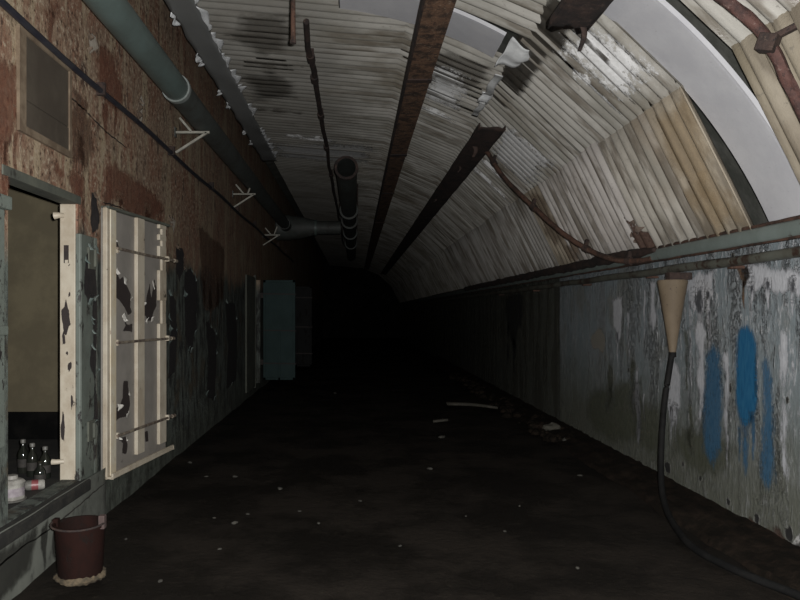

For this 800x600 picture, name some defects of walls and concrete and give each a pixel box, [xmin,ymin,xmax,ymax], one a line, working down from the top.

peeling [84,192,101,423]
peeling [116,268,133,332]
peeling [145,280,157,323]
peeling [61,292,72,371]
peeling [61,395,73,440]
peeling [116,381,131,421]
spalling [785,525,800,547]